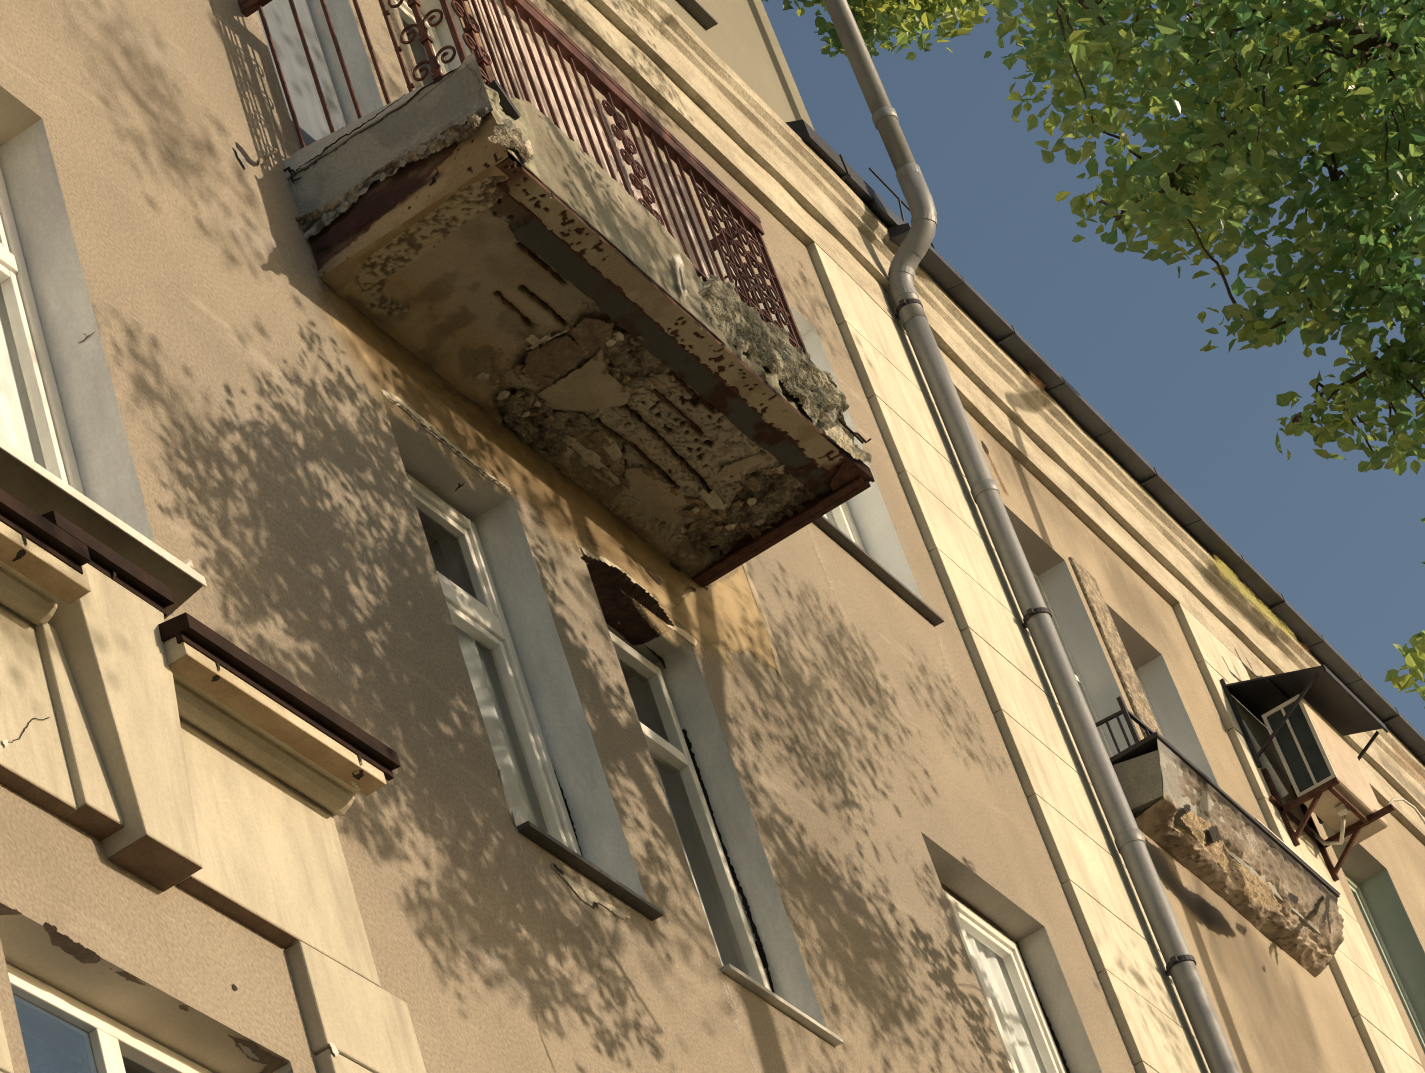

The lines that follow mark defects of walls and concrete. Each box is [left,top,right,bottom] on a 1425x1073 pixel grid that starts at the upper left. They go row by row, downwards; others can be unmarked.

spalling [295,111,534,233]
spalling [698,275,872,463]
spalling [474,330,812,562]
flaking render [581,547,782,675]
crack [2,717,49,747]
flaking render [552,863,630,919]
spalling [1176,803,1299,911]
peeling [43,922,150,987]
peeling [228,1035,293,1073]